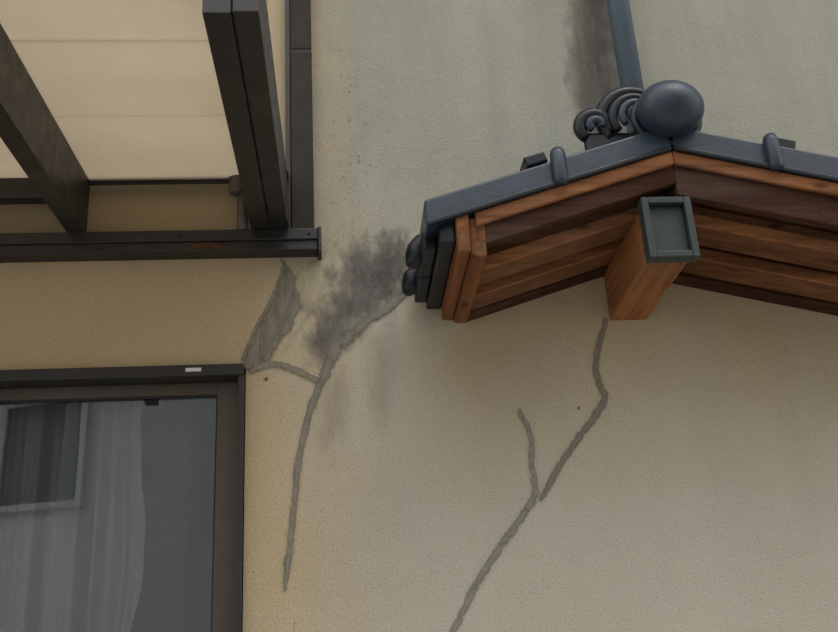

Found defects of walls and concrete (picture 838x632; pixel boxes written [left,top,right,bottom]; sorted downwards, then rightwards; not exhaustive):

crack [248,292,406,591]
crack [450,318,608,632]